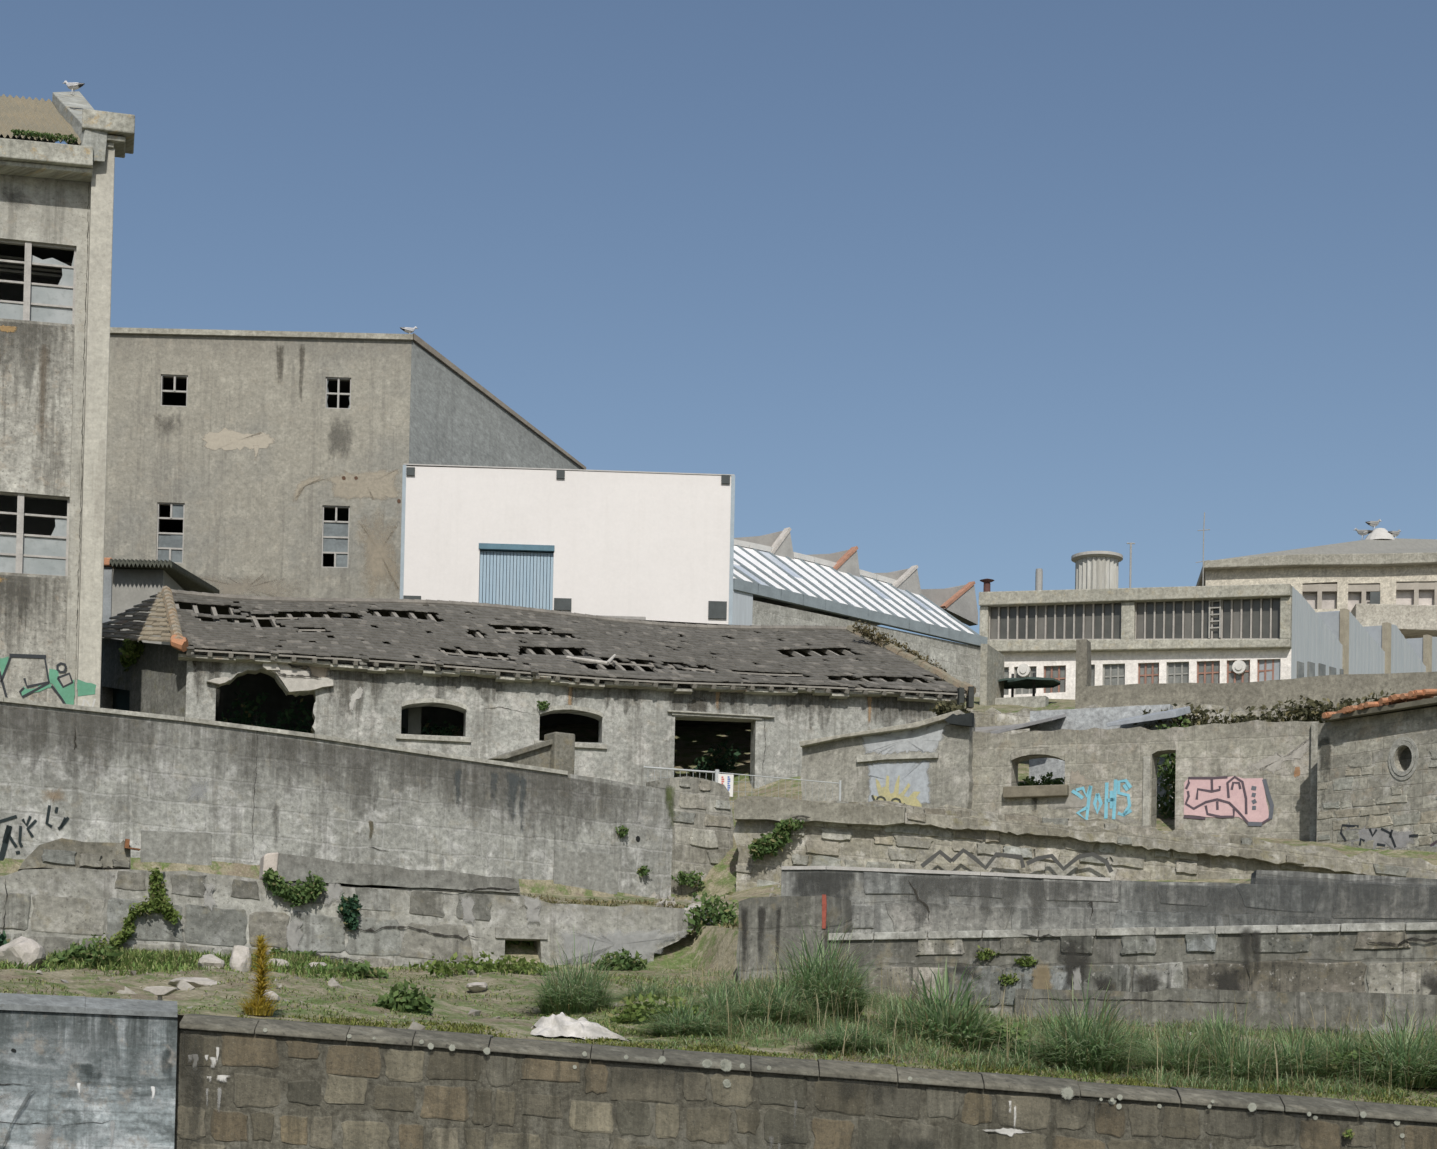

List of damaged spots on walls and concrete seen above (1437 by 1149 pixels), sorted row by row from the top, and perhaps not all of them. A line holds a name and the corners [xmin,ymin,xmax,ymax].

leakage [1061,944,1113,991]
leakage [1138,975,1159,992]